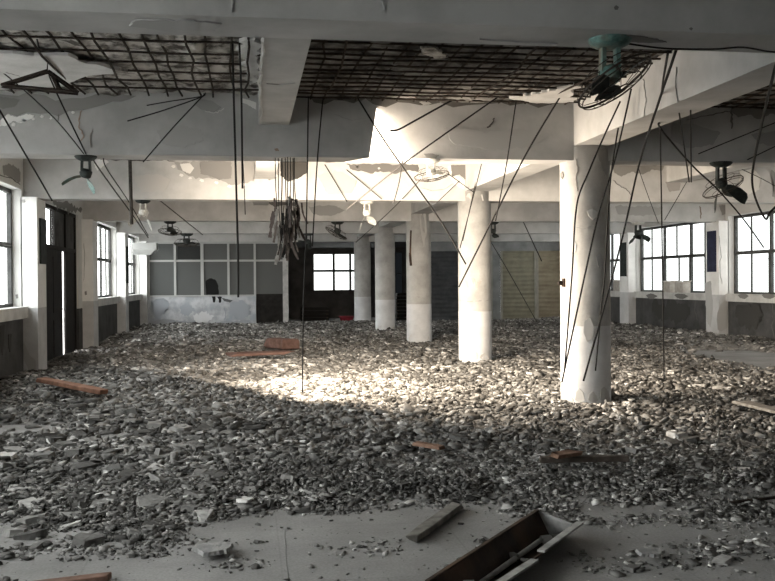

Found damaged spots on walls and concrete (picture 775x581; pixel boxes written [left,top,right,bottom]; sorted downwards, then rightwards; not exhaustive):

spalling [0,30,261,127]
spalling [297,39,673,108]